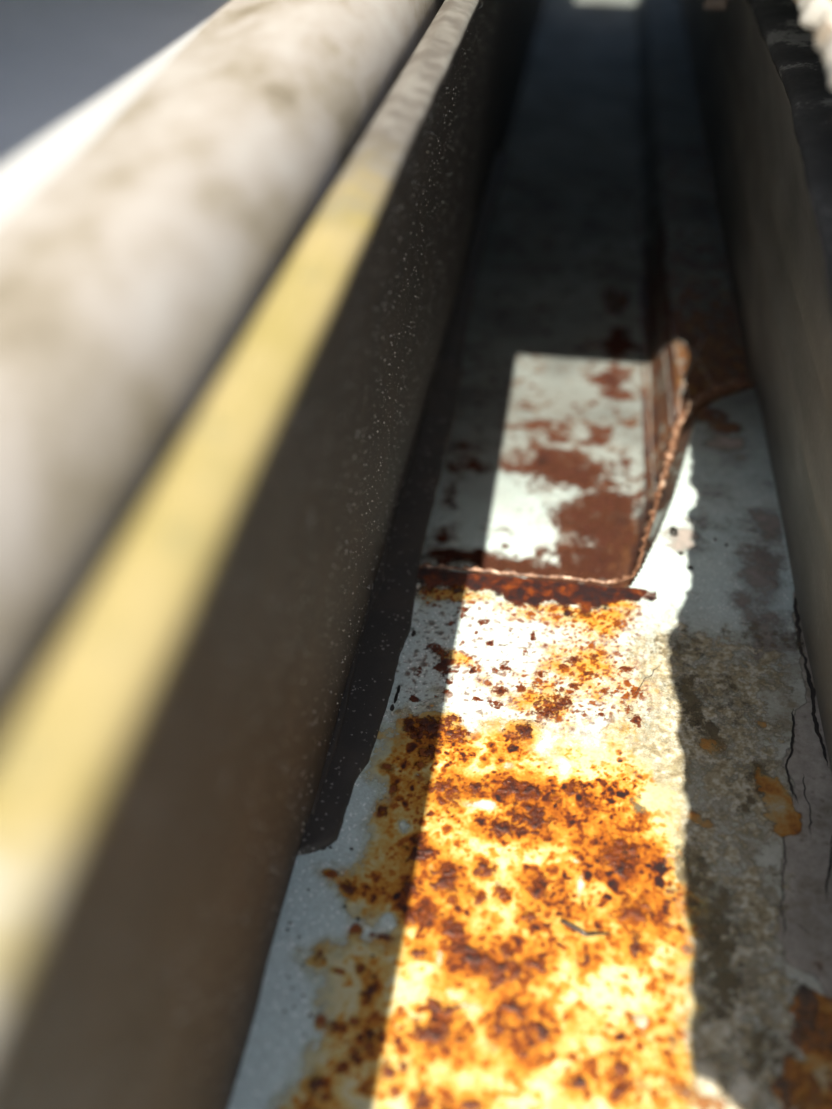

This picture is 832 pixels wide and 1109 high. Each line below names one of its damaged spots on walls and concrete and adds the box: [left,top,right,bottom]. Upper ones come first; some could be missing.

corrosion [277,145,750,1109]
corrosion [754,767,803,837]
crack [785,594,832,900]
crack [780,837,805,940]
corrosion [770,984,832,1109]